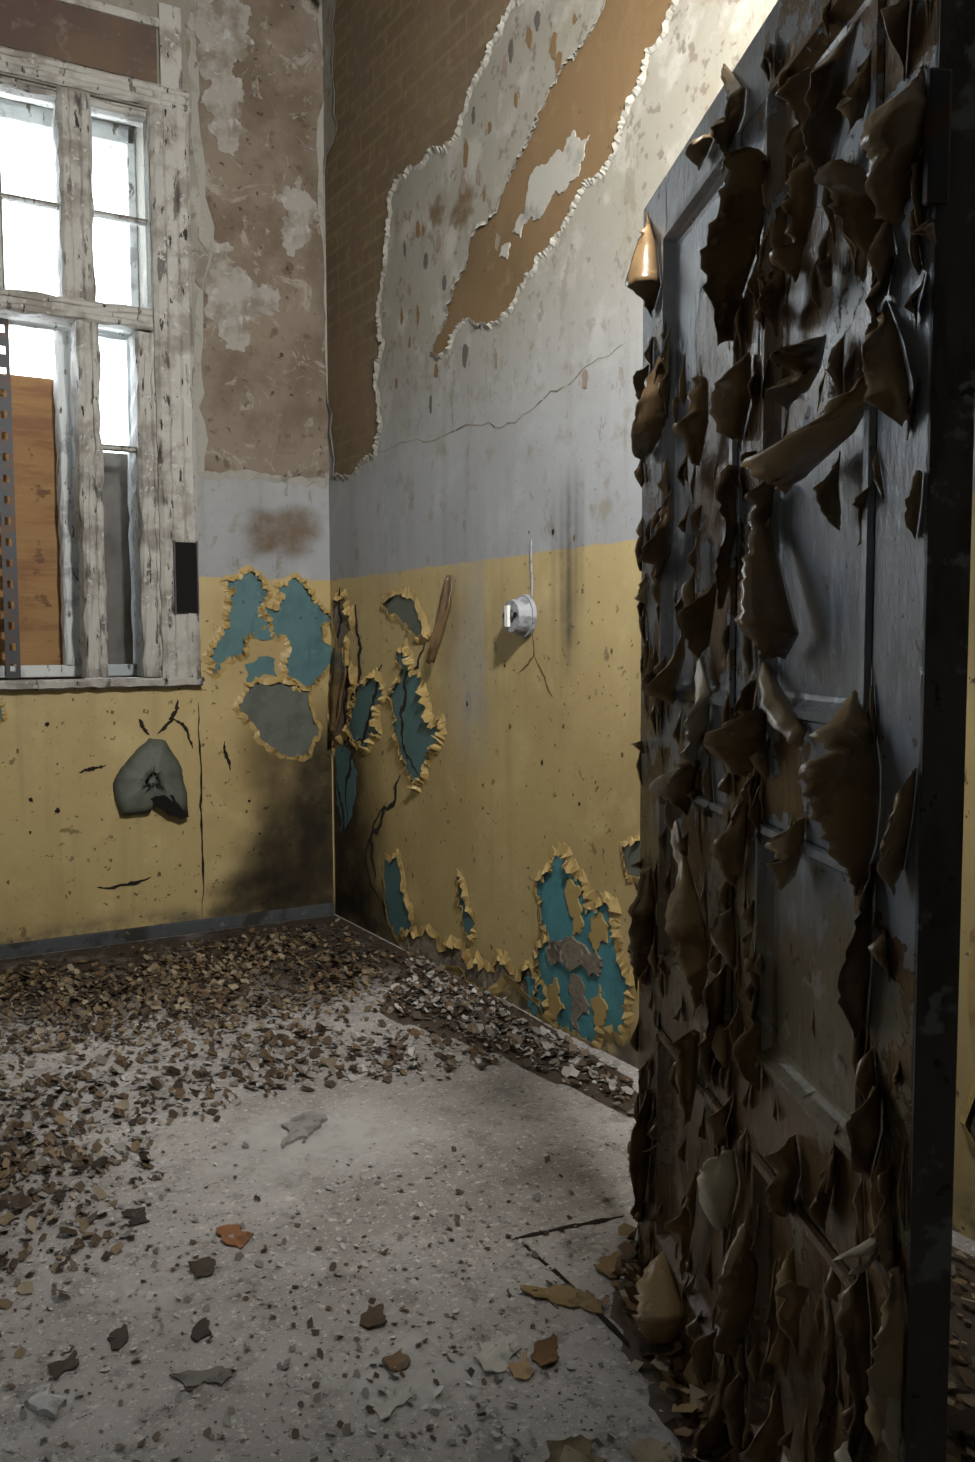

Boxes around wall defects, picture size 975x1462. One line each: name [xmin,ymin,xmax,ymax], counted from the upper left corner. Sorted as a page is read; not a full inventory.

flaking render [186,0,679,489]
peeling [201,565,452,831]
peeling [382,0,927,1357]
leakage [230,752,394,940]
peeling [959,925,975,1156]
peeling [739,1383,785,1462]
peeling [813,1232,906,1462]